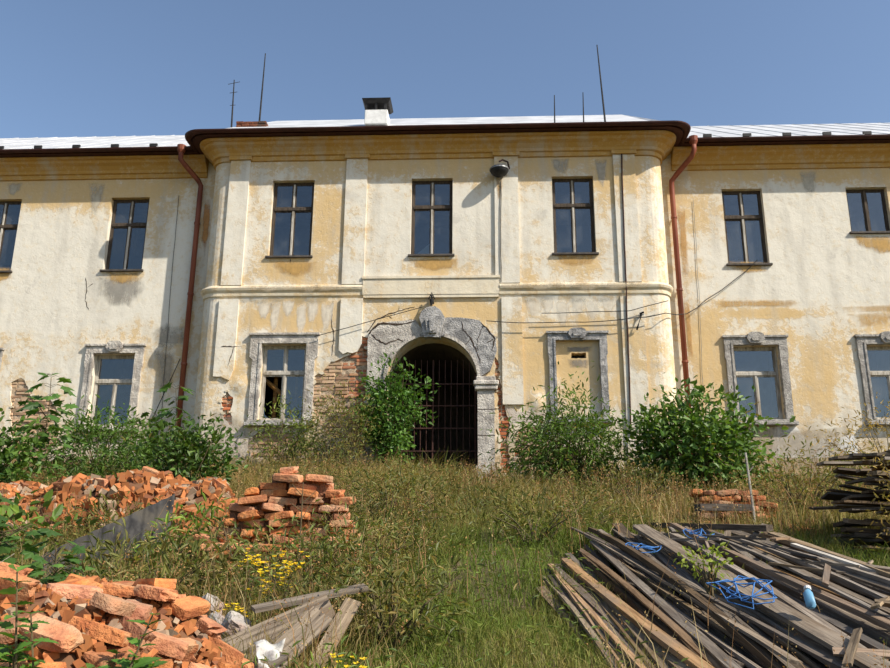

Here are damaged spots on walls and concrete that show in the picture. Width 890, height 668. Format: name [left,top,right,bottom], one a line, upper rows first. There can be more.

water stain [104,273,138,303]
spalling [219,390,306,463]
spalling [312,336,368,451]
spalling [494,358,567,477]